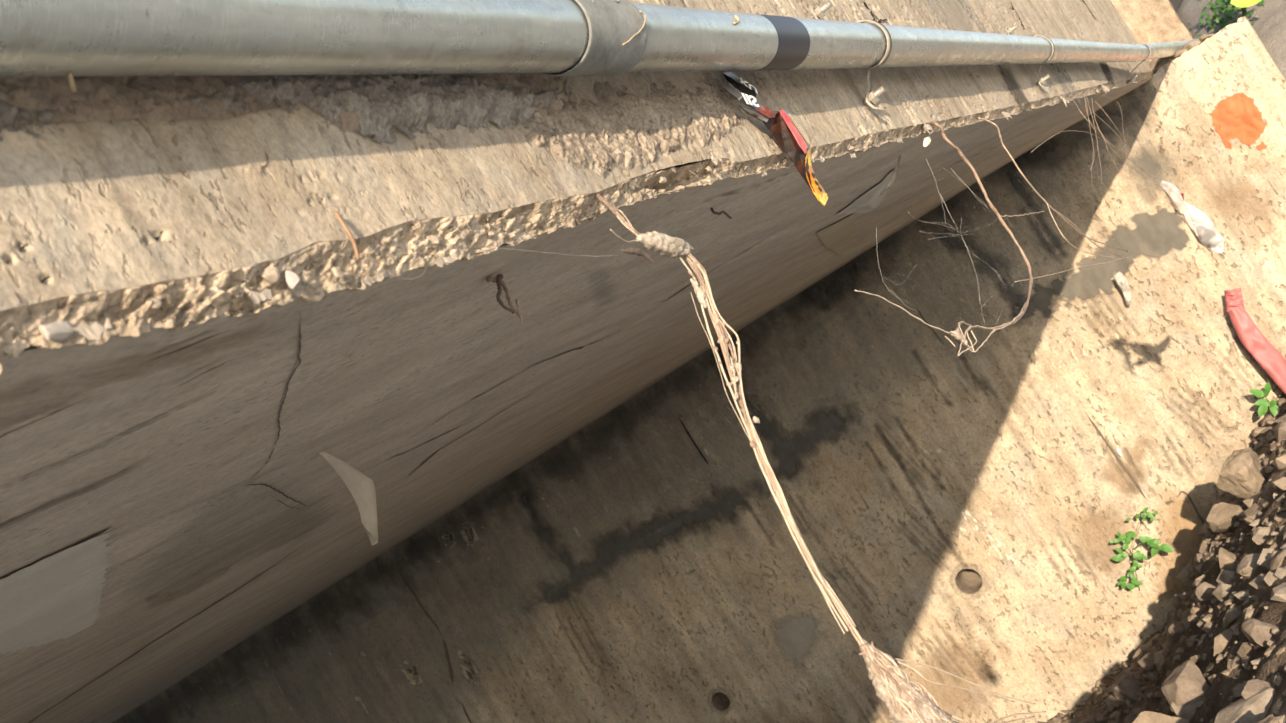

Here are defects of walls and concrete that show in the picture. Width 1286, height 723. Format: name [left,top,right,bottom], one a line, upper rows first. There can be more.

spalling [806,72,1153,215]
spalling [0,148,795,358]
crack [244,304,310,509]
peeling [319,451,378,546]
damp [466,349,854,609]